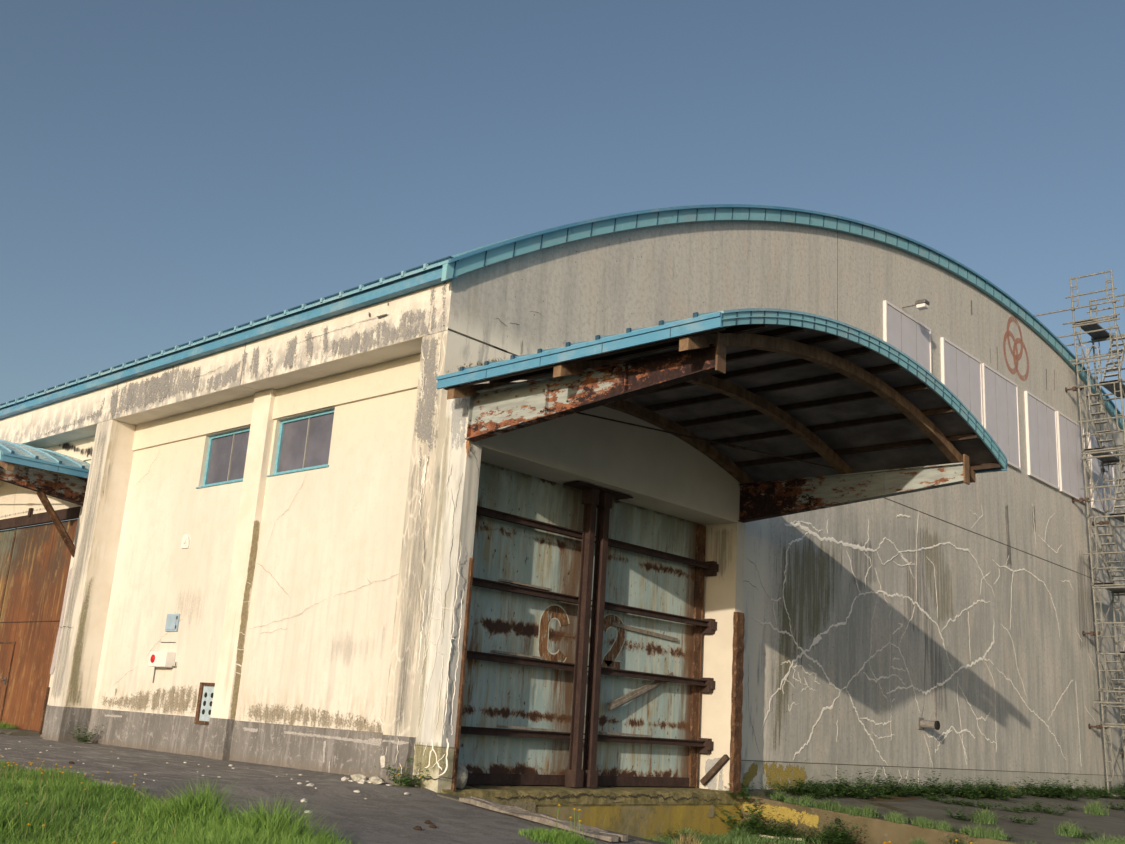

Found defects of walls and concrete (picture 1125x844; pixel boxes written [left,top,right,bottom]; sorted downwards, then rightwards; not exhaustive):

water stain [38,282,446,466]
water stain [102,686,197,713]
water stain [247,703,381,736]
crack [231,445,480,781]
crack [743,505,1095,766]